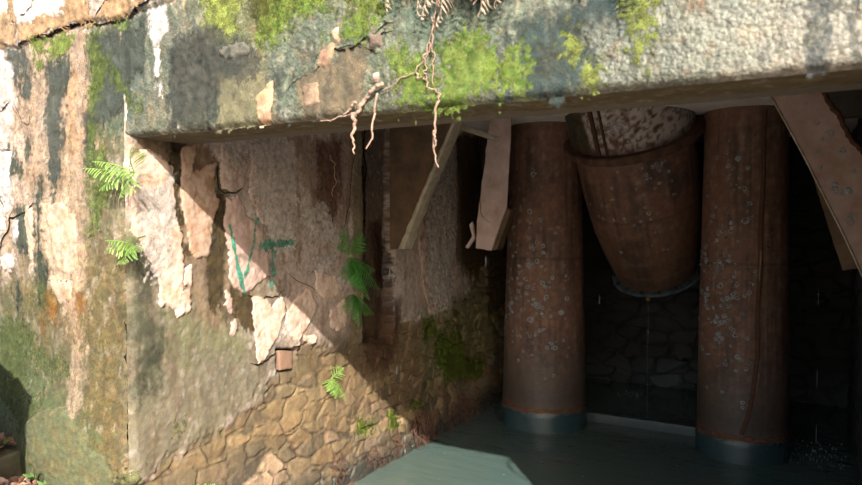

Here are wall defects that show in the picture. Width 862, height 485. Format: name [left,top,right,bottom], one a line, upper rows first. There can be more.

crack [5,0,149,45]
crack [285,19,401,91]
damp [205,71,235,131]
damp [273,69,294,115]
peeling [0,0,143,305]
damp [4,4,204,304]
crack [0,196,33,249]
flaking render [123,23,348,364]
crack [217,162,261,225]
crack [341,130,371,251]